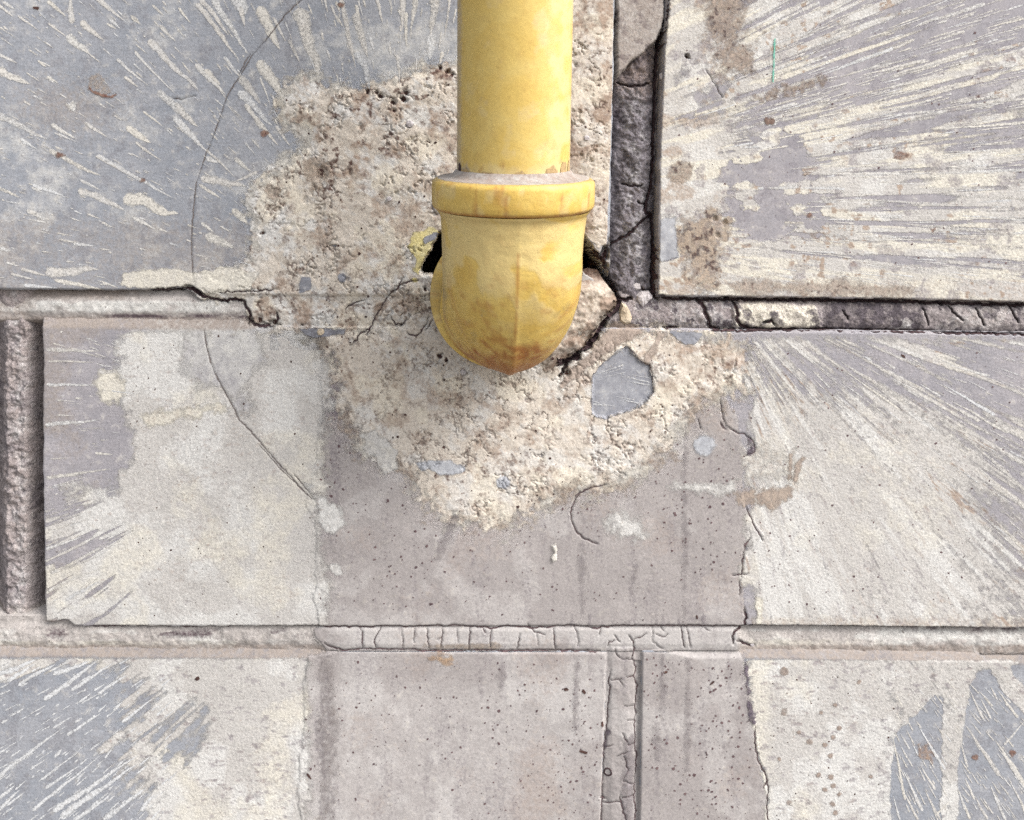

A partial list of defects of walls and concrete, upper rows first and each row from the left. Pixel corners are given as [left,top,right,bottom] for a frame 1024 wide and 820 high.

crack [155,0,301,328]
peeling [546,162,570,174]
crack [556,0,1024,376]
spalling [659,217,679,262]
spalling [299,277,311,293]
spalling [300,328,345,338]
crack [346,277,431,345]
spalling [632,283,653,307]
spalling [591,346,654,419]
crack [570,484,606,544]
crack [266,508,762,820]
crack [754,727,769,820]